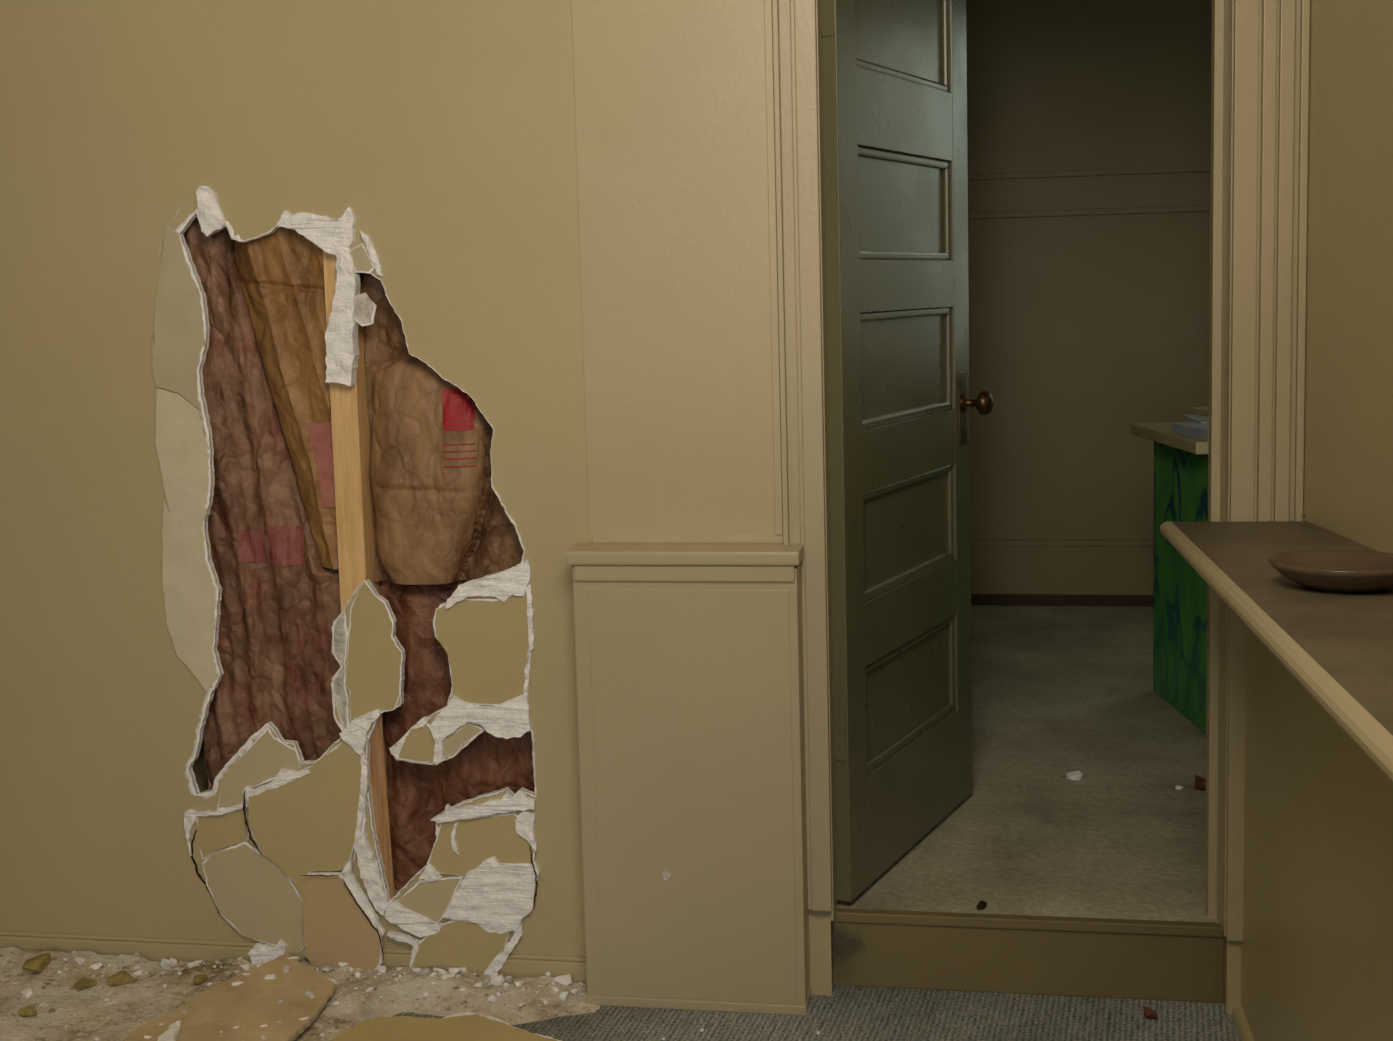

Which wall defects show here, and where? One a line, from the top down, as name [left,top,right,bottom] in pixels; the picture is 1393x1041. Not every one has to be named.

spalling [152,185,541,975]